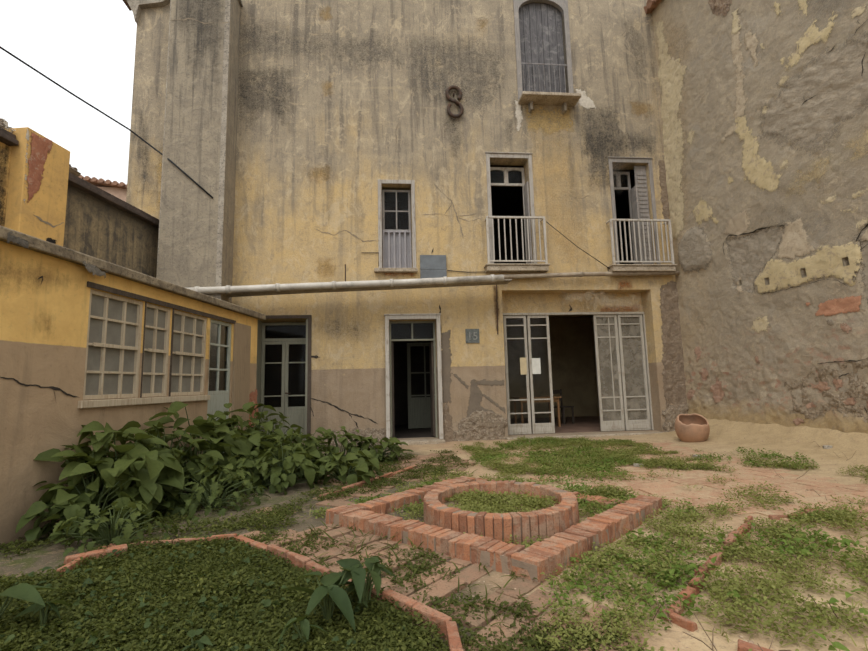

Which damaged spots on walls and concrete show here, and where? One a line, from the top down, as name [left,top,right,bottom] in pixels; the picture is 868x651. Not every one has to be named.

peeling [514,100,523,131]
peeling [576,89,596,109]
water stain [0,147,8,227]
peeling [24,129,53,203]
peeling [654,0,868,334]
crack [0,377,80,399]
spalling [784,359,868,425]